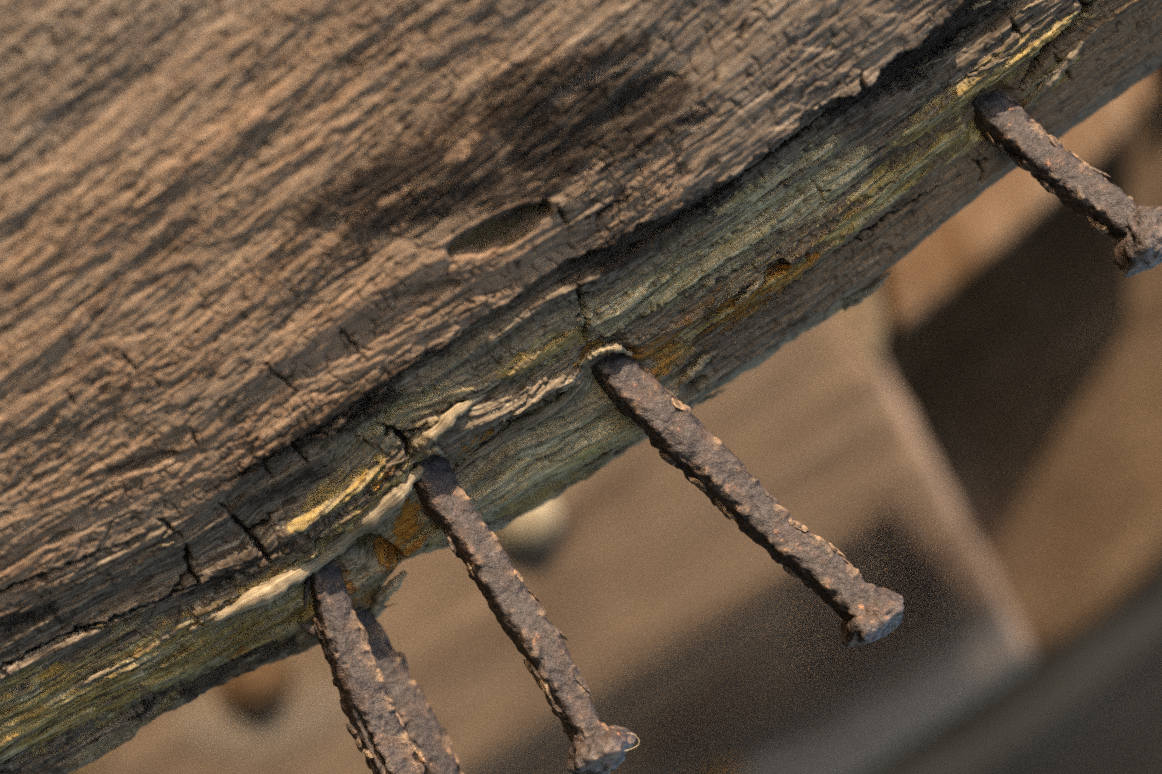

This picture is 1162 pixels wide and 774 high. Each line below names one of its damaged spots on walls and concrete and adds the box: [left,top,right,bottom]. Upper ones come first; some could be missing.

crack [1002,1,1070,78]
crack [675,112,826,218]
rust [985,132,1055,194]
crack [557,194,630,222]
crack [842,185,938,246]
rust [573,252,820,411]
crack [263,406,426,474]
crack [206,476,271,560]
rust [374,499,426,574]
rust [689,477,735,521]
rust [523,659,562,718]
rust [346,723,377,774]